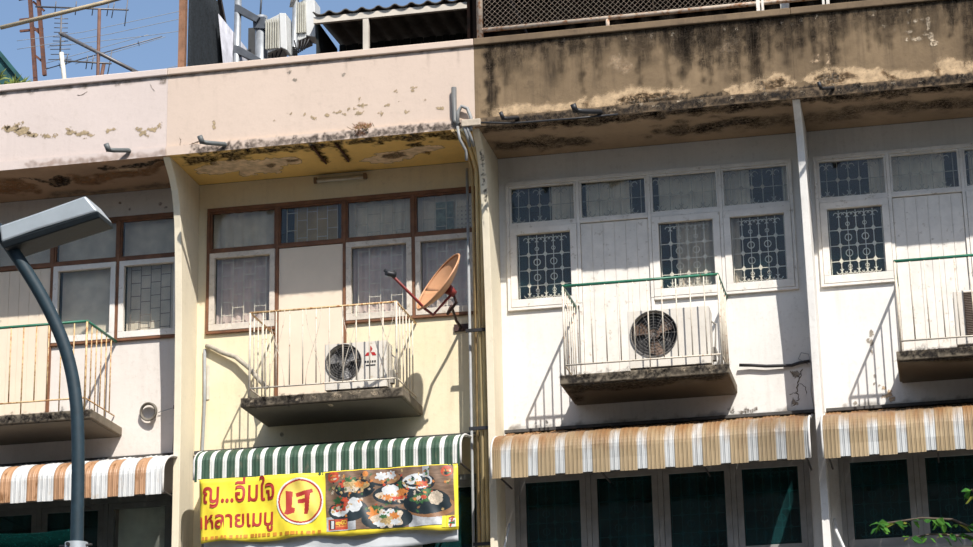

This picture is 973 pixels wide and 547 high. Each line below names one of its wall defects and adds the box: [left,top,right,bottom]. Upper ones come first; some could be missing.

peeling [906,9,938,46]
damp [483,0,973,149]
peeling [290,97,367,120]
peeling [2,121,116,139]
damp [182,123,471,165]
damp [53,160,165,196]